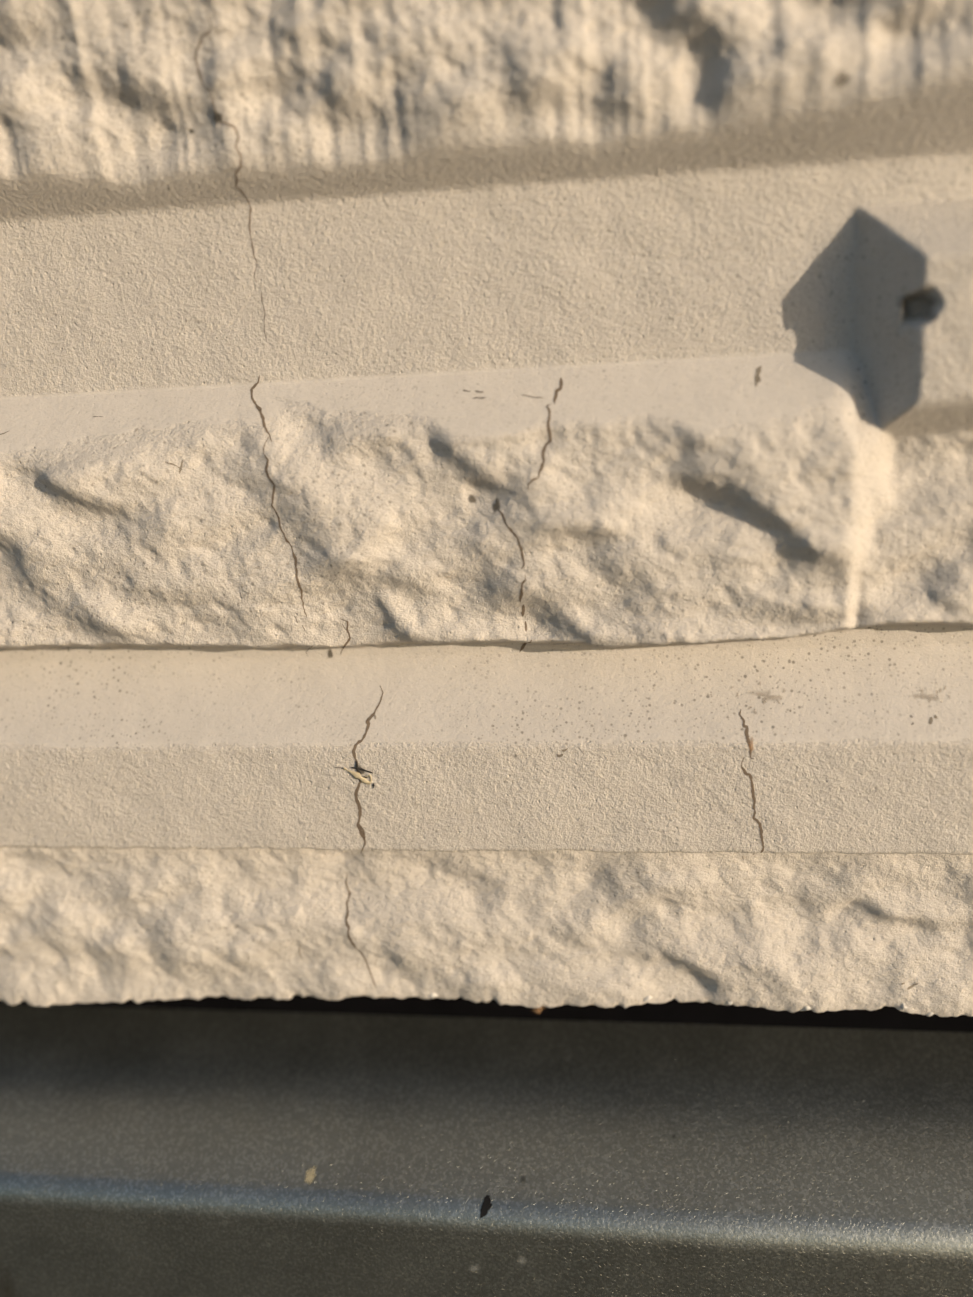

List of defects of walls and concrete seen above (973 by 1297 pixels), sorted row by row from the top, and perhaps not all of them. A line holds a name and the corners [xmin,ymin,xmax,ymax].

crack [182,15,267,341]
crack [250,375,351,656]
crack [497,509,532,652]
crack [523,378,563,490]
crack [336,686,384,999]
crack [739,710,764,861]